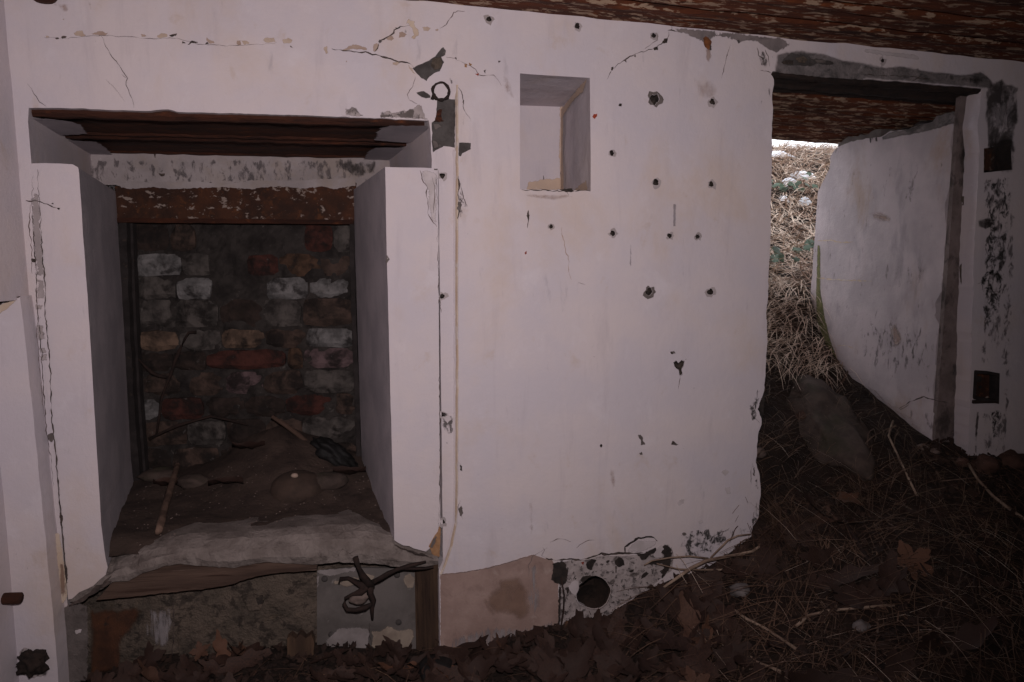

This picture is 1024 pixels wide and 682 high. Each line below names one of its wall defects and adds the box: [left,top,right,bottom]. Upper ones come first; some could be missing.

crack [324,11,464,73]
crack [608,29,677,77]
leakage [970,78,1017,324]
peeling [380,48,471,575]
crack [0,169,111,607]
leakage [440,553,559,647]
peeling [551,541,674,625]